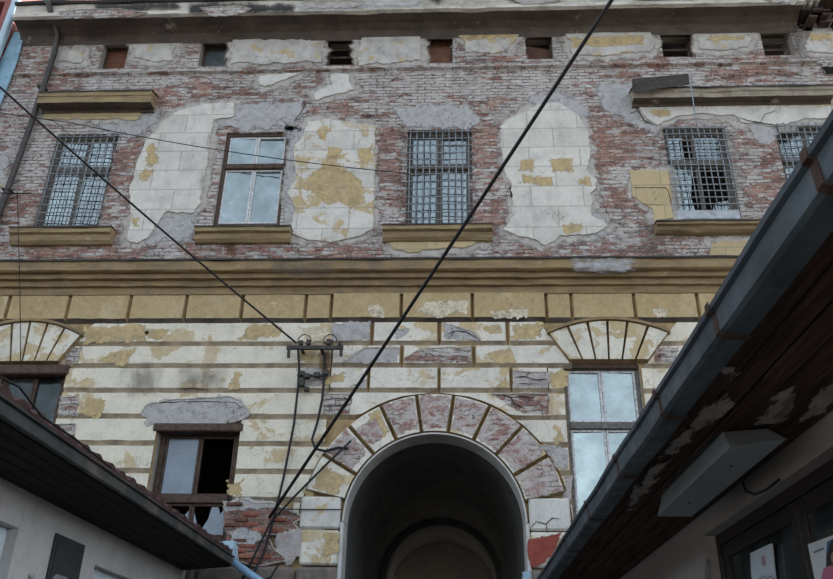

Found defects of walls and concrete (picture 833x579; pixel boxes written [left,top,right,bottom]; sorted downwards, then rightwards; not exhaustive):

peeling [36,32,833,259]
flaking render [0,178,28,223]
spalling [140,372,251,426]
spalling [296,299,573,501]
crack [503,372,546,408]
peeling [627,365,740,511]
peeling [753,381,833,426]
flaking render [222,478,340,567]